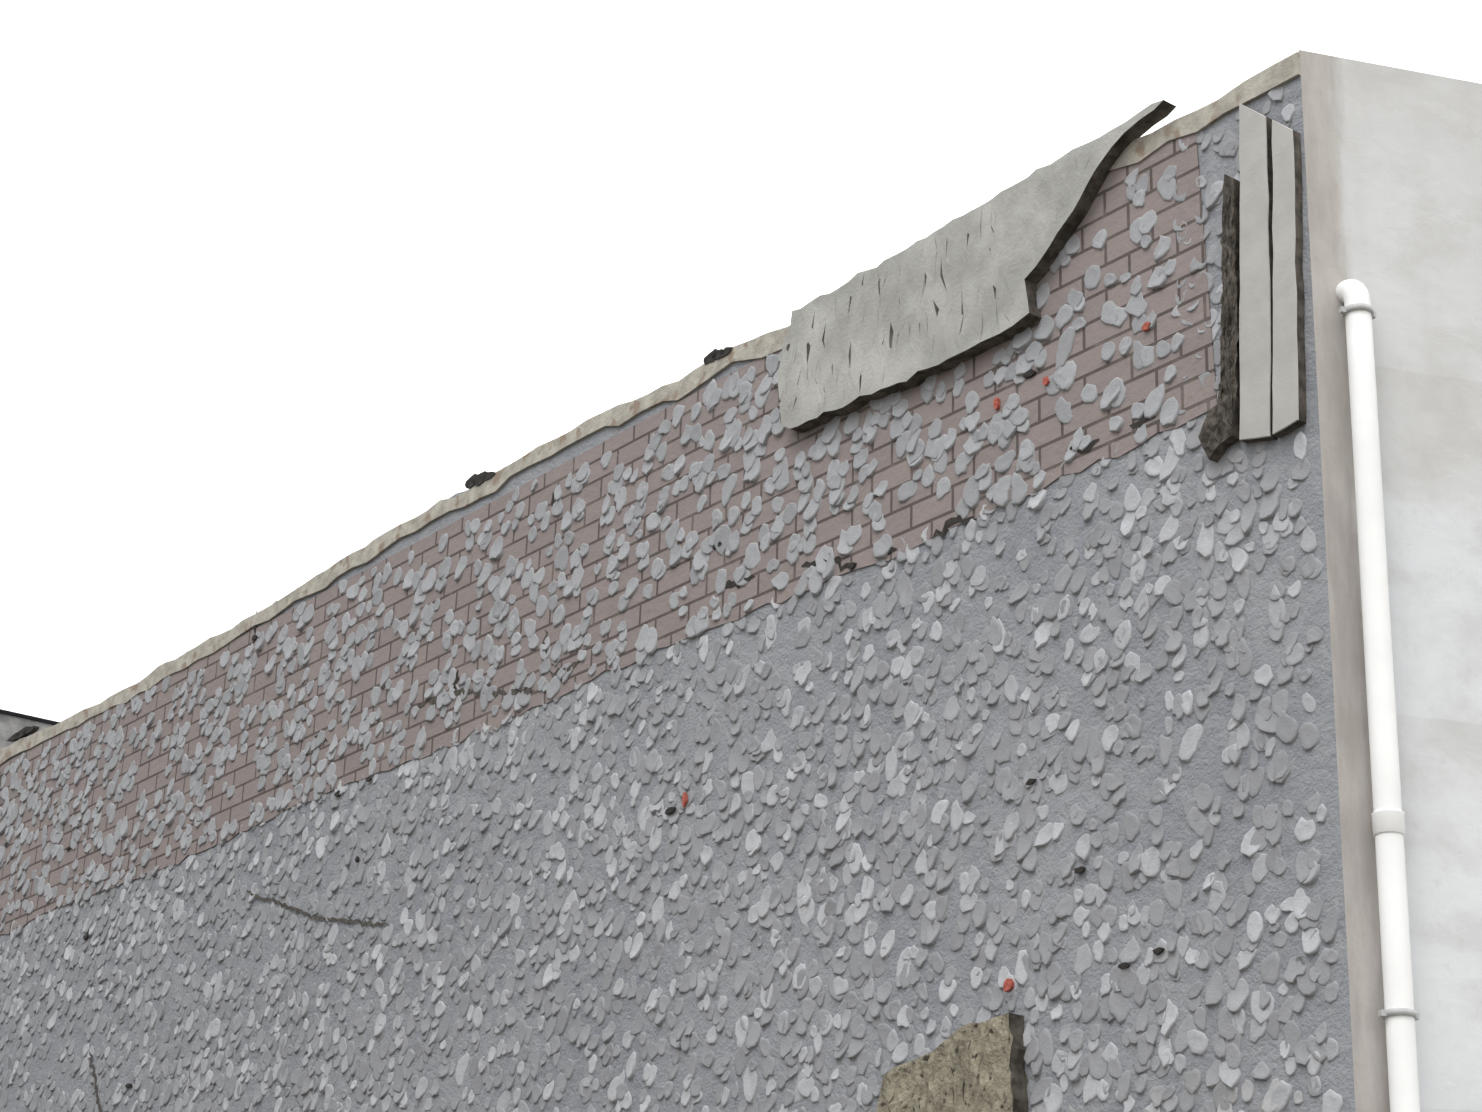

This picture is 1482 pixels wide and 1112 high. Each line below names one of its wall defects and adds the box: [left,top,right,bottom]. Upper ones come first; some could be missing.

peeling [1261,85,1295,128]
peeling [0,128,1239,1112]
peeling [950,152,1343,1112]